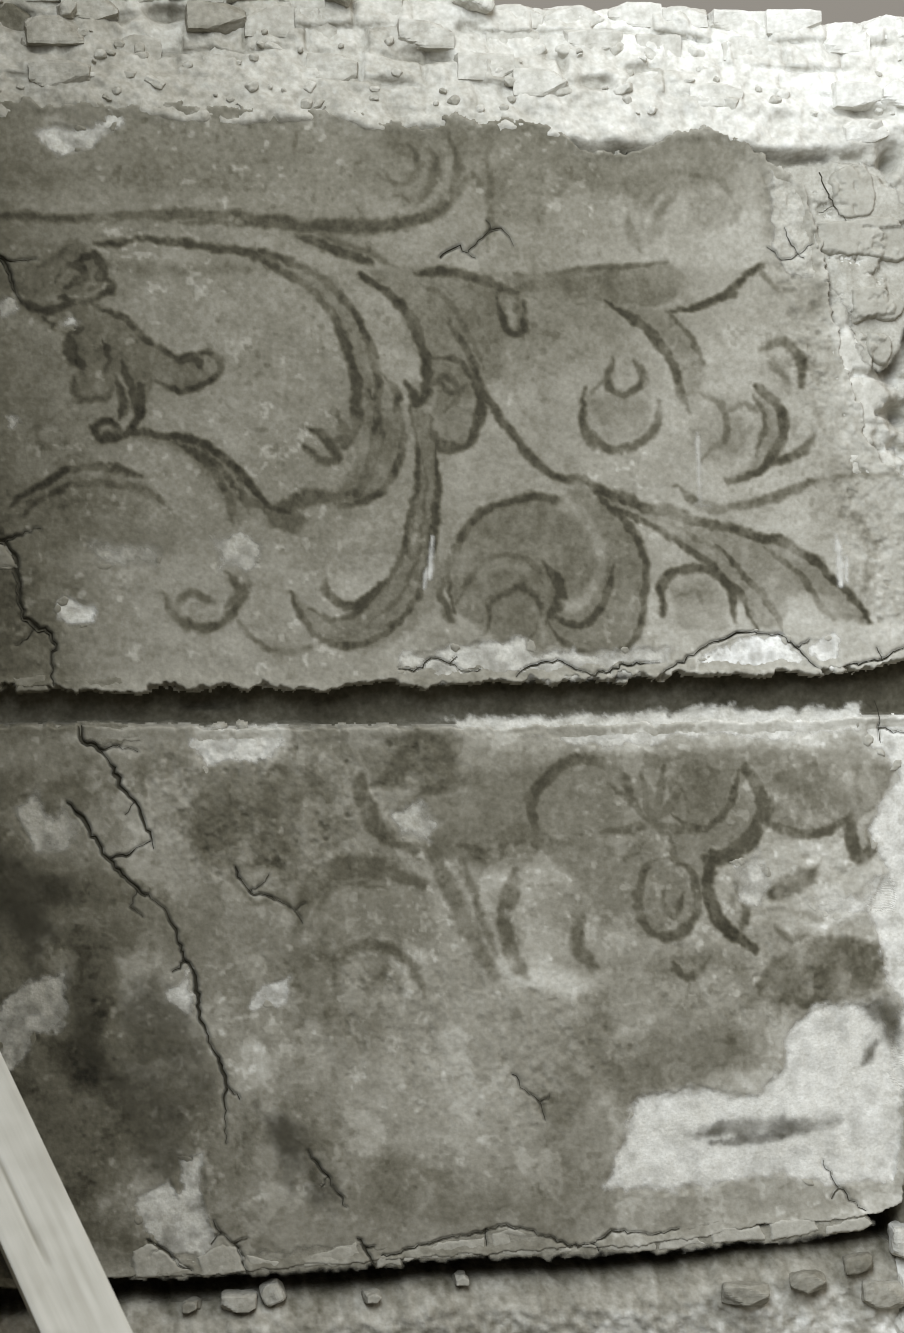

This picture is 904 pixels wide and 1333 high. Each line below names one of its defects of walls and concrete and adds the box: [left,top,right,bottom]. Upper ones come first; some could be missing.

peeling [38,115,123,155]
crack [440,221,514,259]
crack [0,256,33,301]
spalling [770,161,904,371]
crack [0,528,58,686]
crack [400,656,480,672]
crack [516,631,904,679]
peeling [698,629,847,674]
crack [66,725,240,1143]
peeling [457,703,904,1193]
crack [147,1240,192,1271]
crack [357,1224,680,1267]